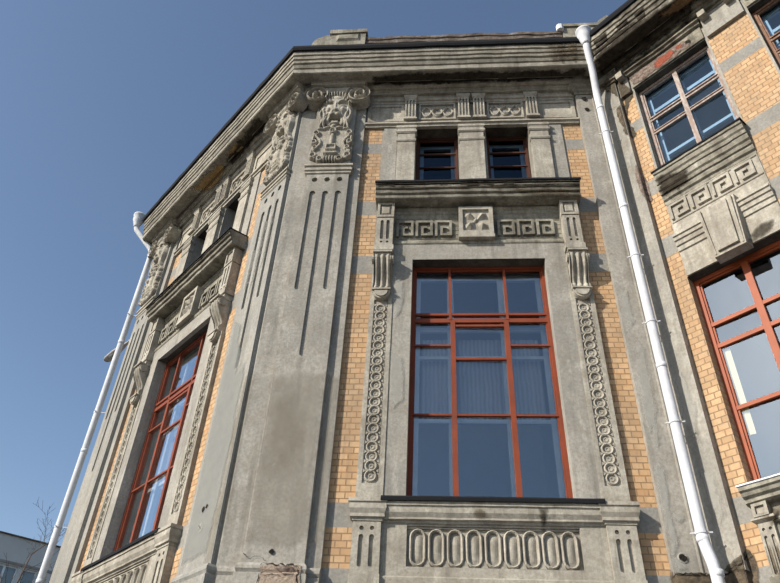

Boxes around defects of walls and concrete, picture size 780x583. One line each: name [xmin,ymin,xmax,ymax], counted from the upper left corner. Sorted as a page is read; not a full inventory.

leakage [592,0,696,75]
leakage [372,43,586,85]
spalling [599,39,690,138]
leakage [657,170,688,196]
peeling [676,373,697,437]
peeling [701,472,723,519]
spalling [256,563,301,583]
spalling [670,572,712,583]
spalling [724,549,758,583]